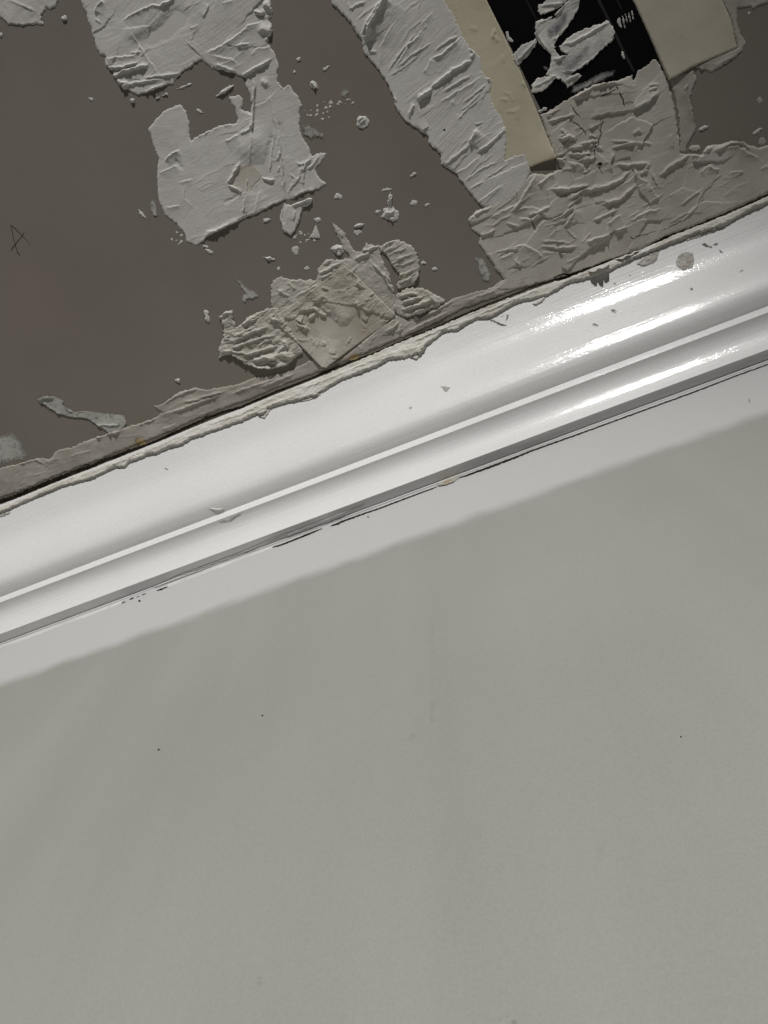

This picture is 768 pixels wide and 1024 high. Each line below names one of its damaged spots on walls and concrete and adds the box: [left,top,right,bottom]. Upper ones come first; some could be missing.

peeling [686,222,726,241]
crack [0,195,768,503]
peeling [410,346,427,360]
peeling [291,392,321,402]